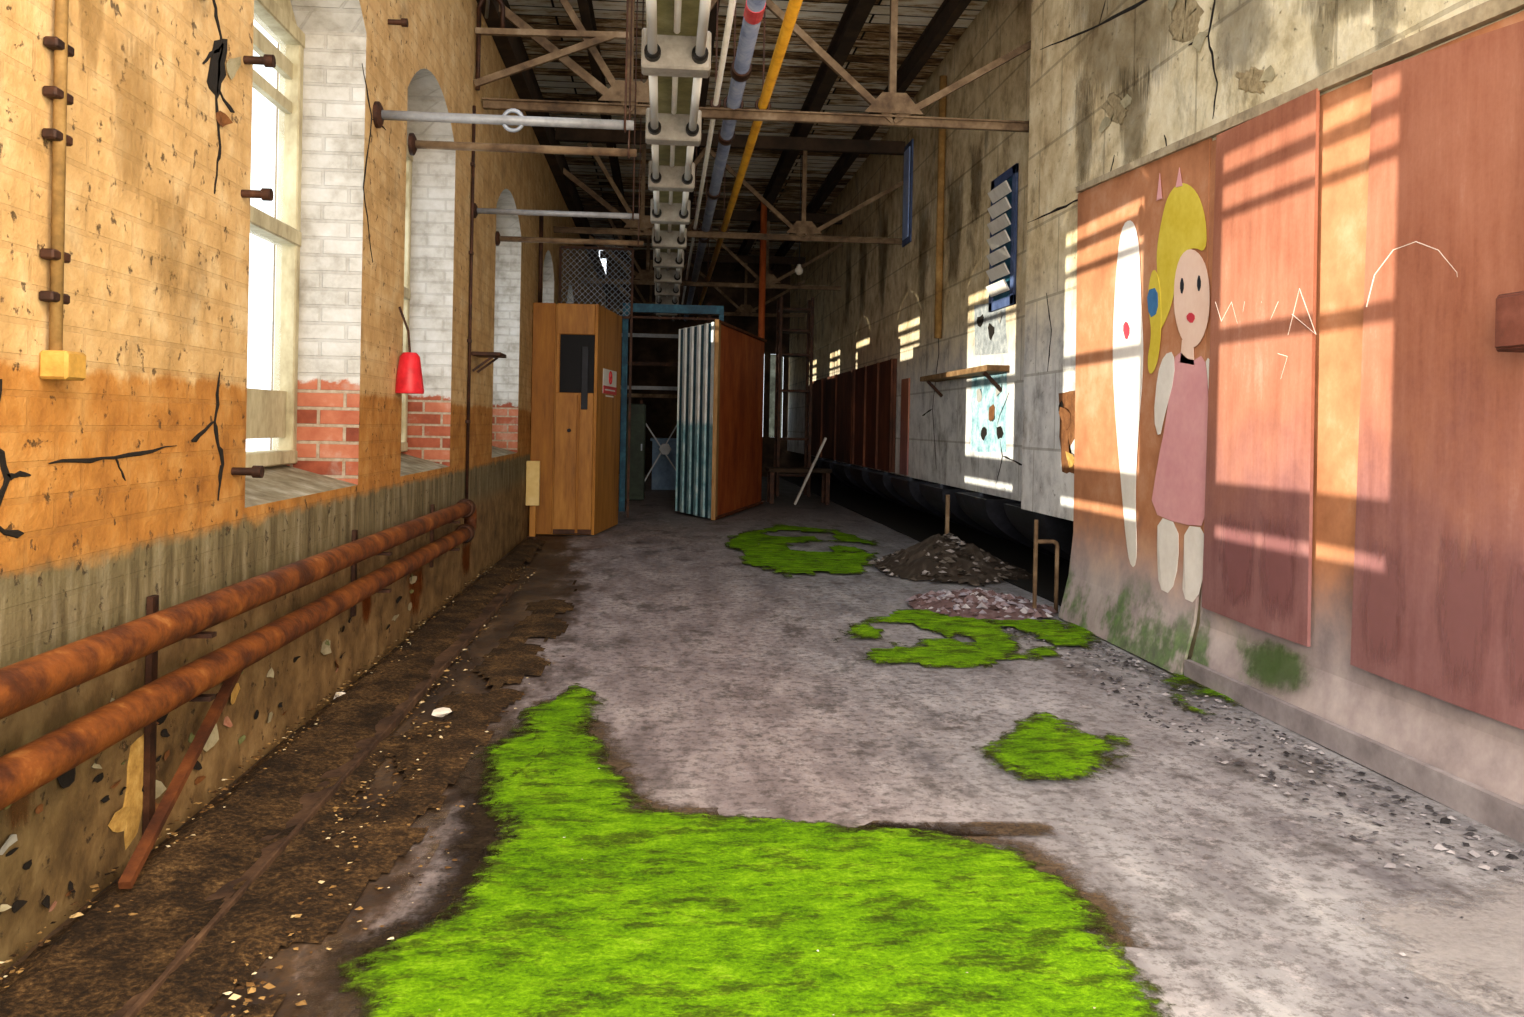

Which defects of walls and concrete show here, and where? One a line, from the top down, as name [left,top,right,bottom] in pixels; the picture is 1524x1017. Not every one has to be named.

crack [0,372,224,539]
rust [409,568,423,612]